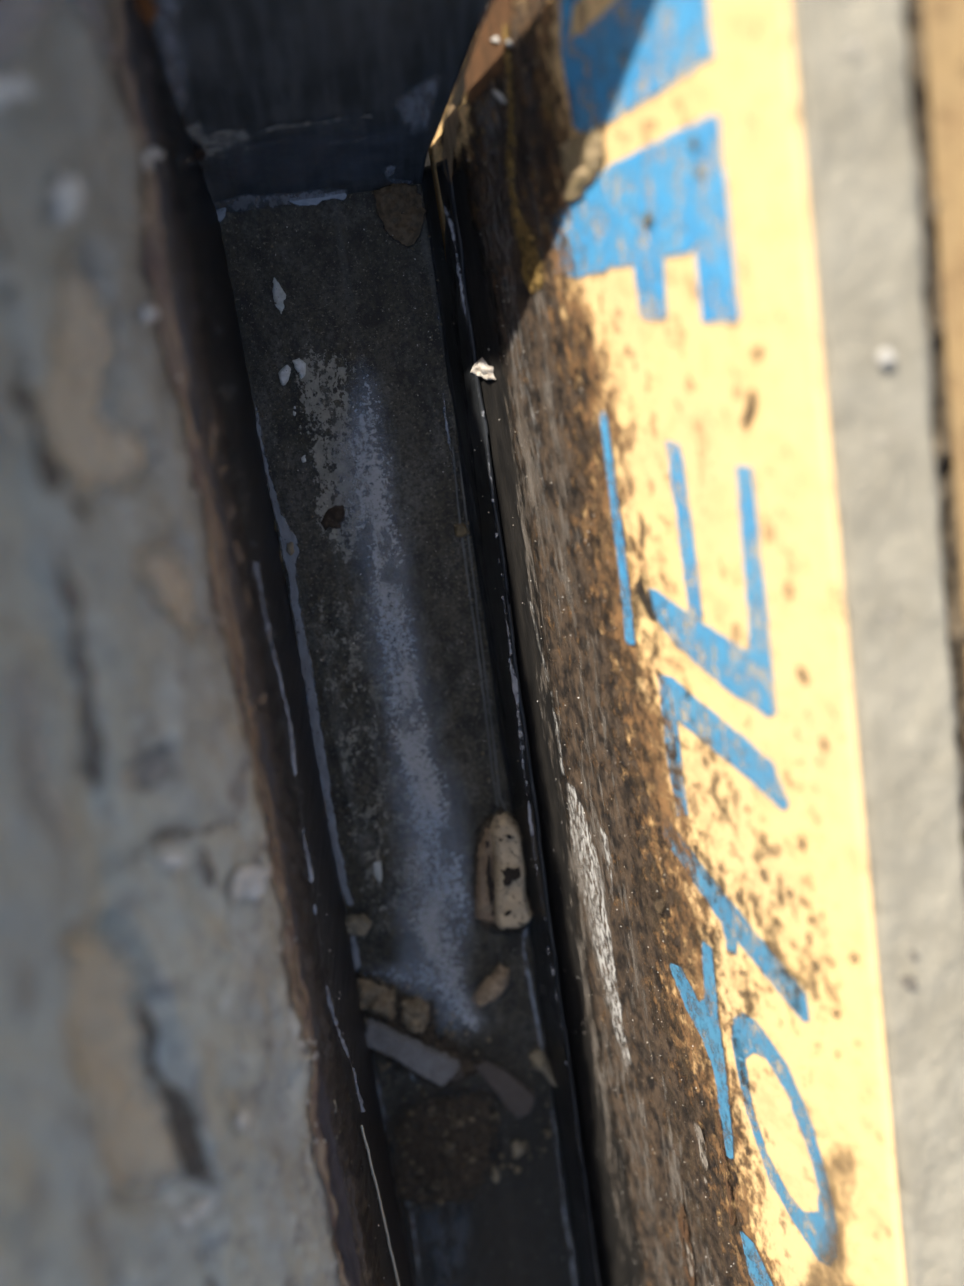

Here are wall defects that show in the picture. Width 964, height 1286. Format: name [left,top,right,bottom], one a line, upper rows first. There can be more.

damp [185,118,346,162]
damp [272,278,286,314]
damp [216,189,347,222]
rust [445,206,468,326]
rust [464,0,544,294]
damp [278,341,369,564]
damp [255,406,455,941]
rust [502,595,537,870]
damp [397,0,839,1286]
damp [350,935,361,971]
damp [807,1153,852,1286]